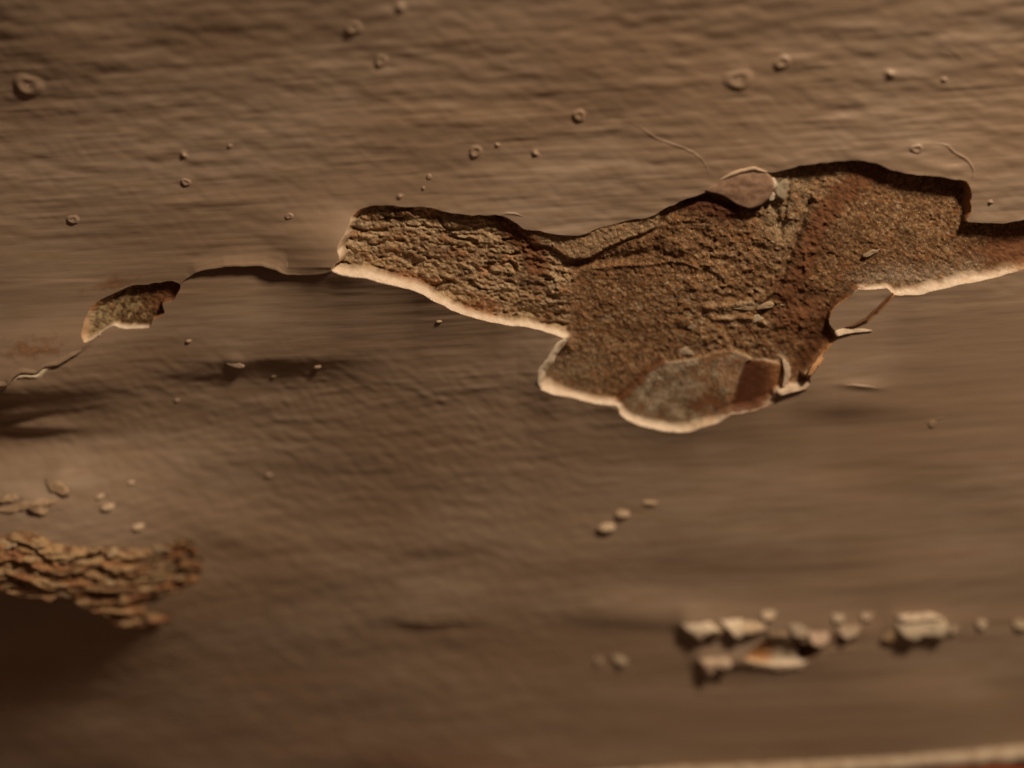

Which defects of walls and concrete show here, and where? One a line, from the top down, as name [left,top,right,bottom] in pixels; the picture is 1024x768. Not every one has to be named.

corrosion [772,162,887,371]
corrosion [979,230,1024,266]
spalling [81,160,1024,433]
crack [0,349,82,390]
peeling [0,477,70,515]
peeling [0,531,203,629]
peeling [681,610,873,670]
peeling [881,612,959,643]
peeling [698,657,732,677]